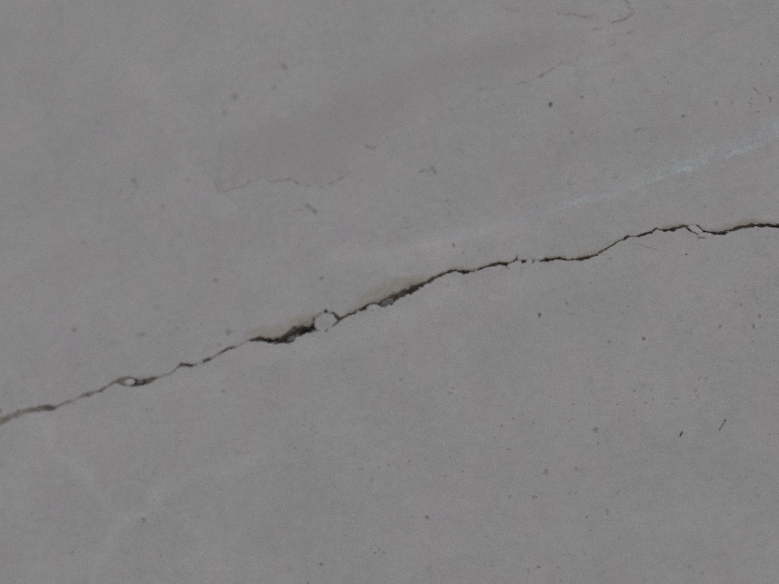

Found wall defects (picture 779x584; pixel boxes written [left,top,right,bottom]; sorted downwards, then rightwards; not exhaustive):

crack [0,223,779,425]